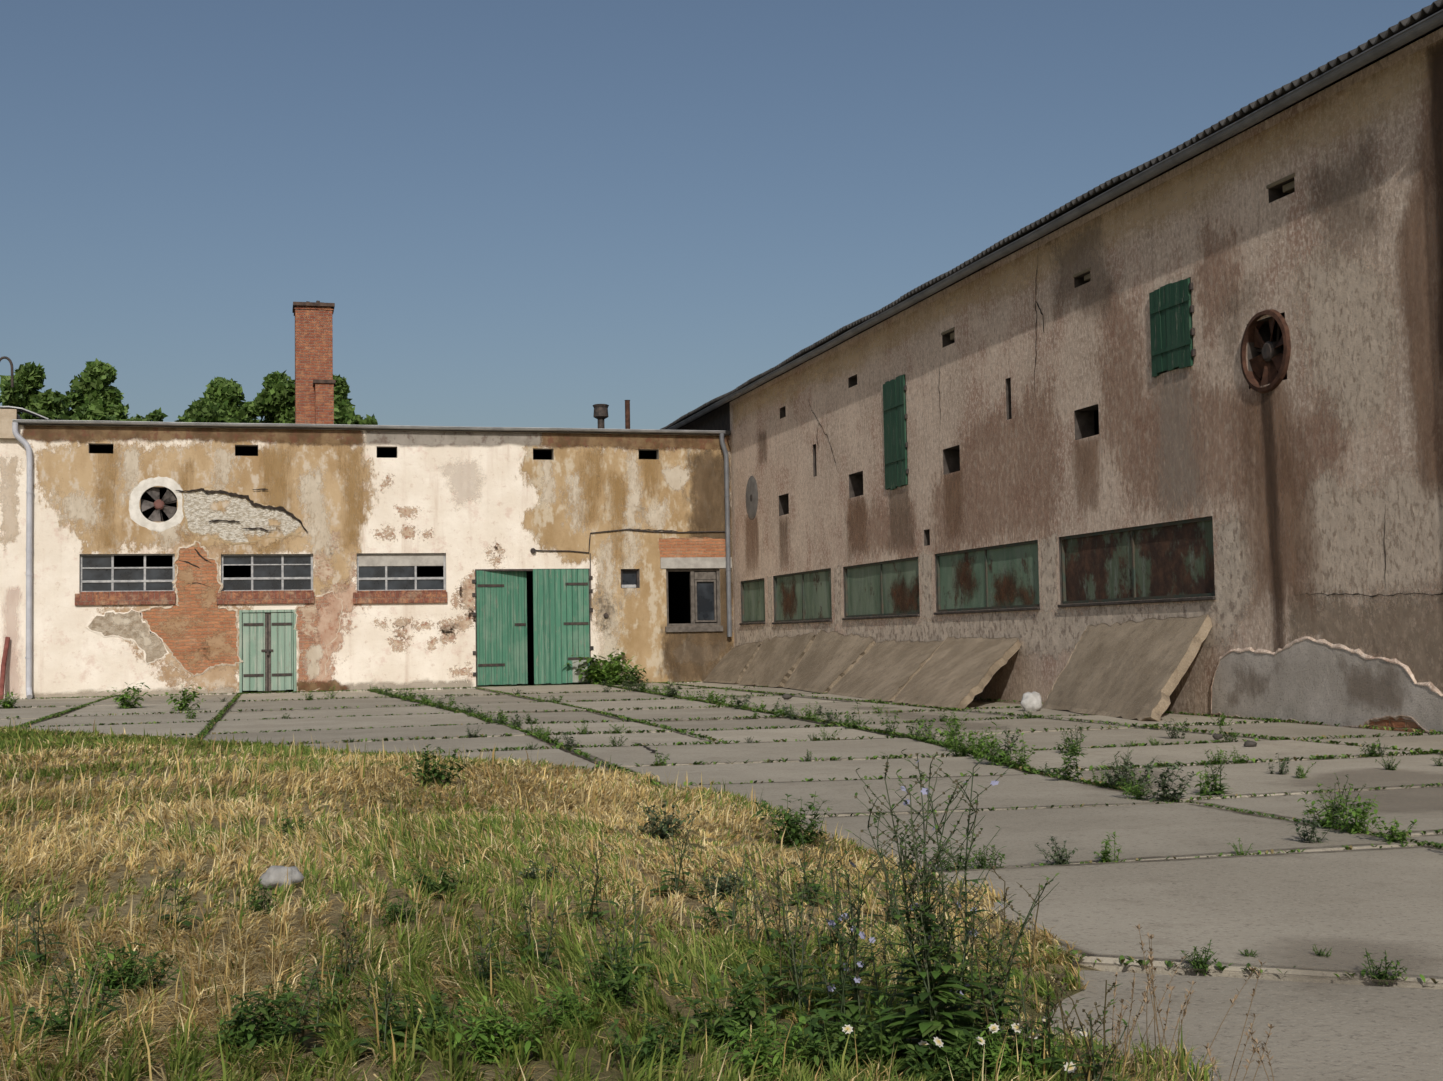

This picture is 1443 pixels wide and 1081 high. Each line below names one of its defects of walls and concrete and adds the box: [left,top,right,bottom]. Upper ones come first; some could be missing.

leakage [1400,44,1443,486]
peeling [0,439,507,693]
leakage [21,425,734,683]
rust [780,581,797,619]
rust [954,556,977,602]
rust [992,571,1034,607]
leakage [1290,589,1443,692]